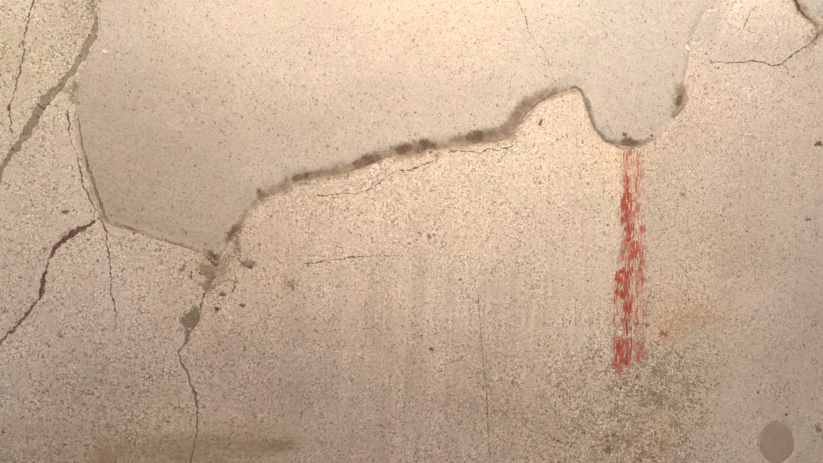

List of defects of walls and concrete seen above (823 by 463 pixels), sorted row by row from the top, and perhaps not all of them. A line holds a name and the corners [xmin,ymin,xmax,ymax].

crack [709,35,818,71]
spalling [794,0,823,33]
crack [0,0,117,345]
spalling [253,86,653,204]
spalling [79,121,236,344]
spalling [227,221,256,269]
crack [177,297,203,463]